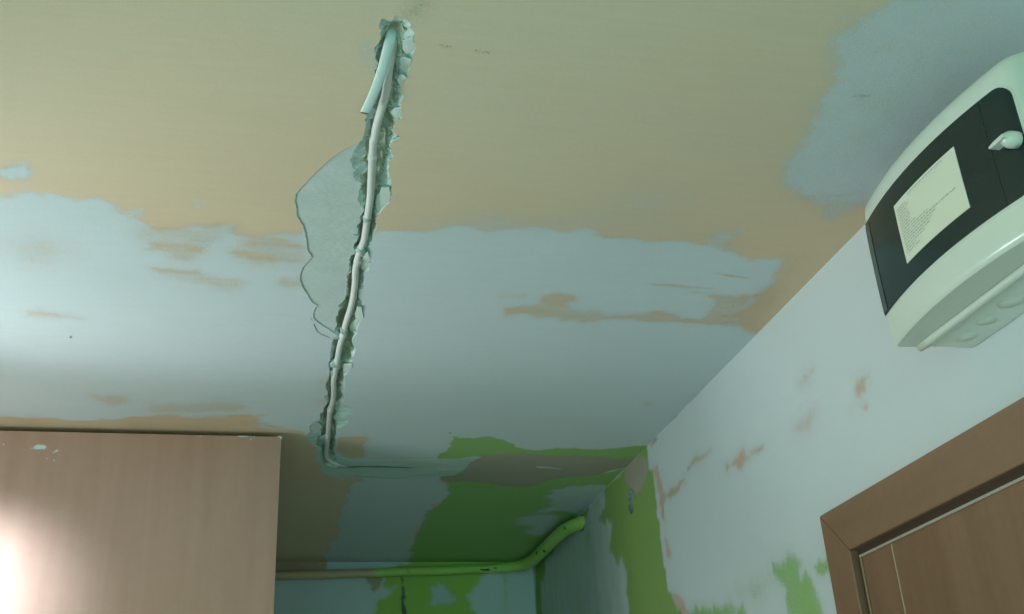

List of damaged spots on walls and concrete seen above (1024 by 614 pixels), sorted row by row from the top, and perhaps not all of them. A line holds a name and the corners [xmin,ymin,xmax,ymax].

peeling [294,16,416,468]